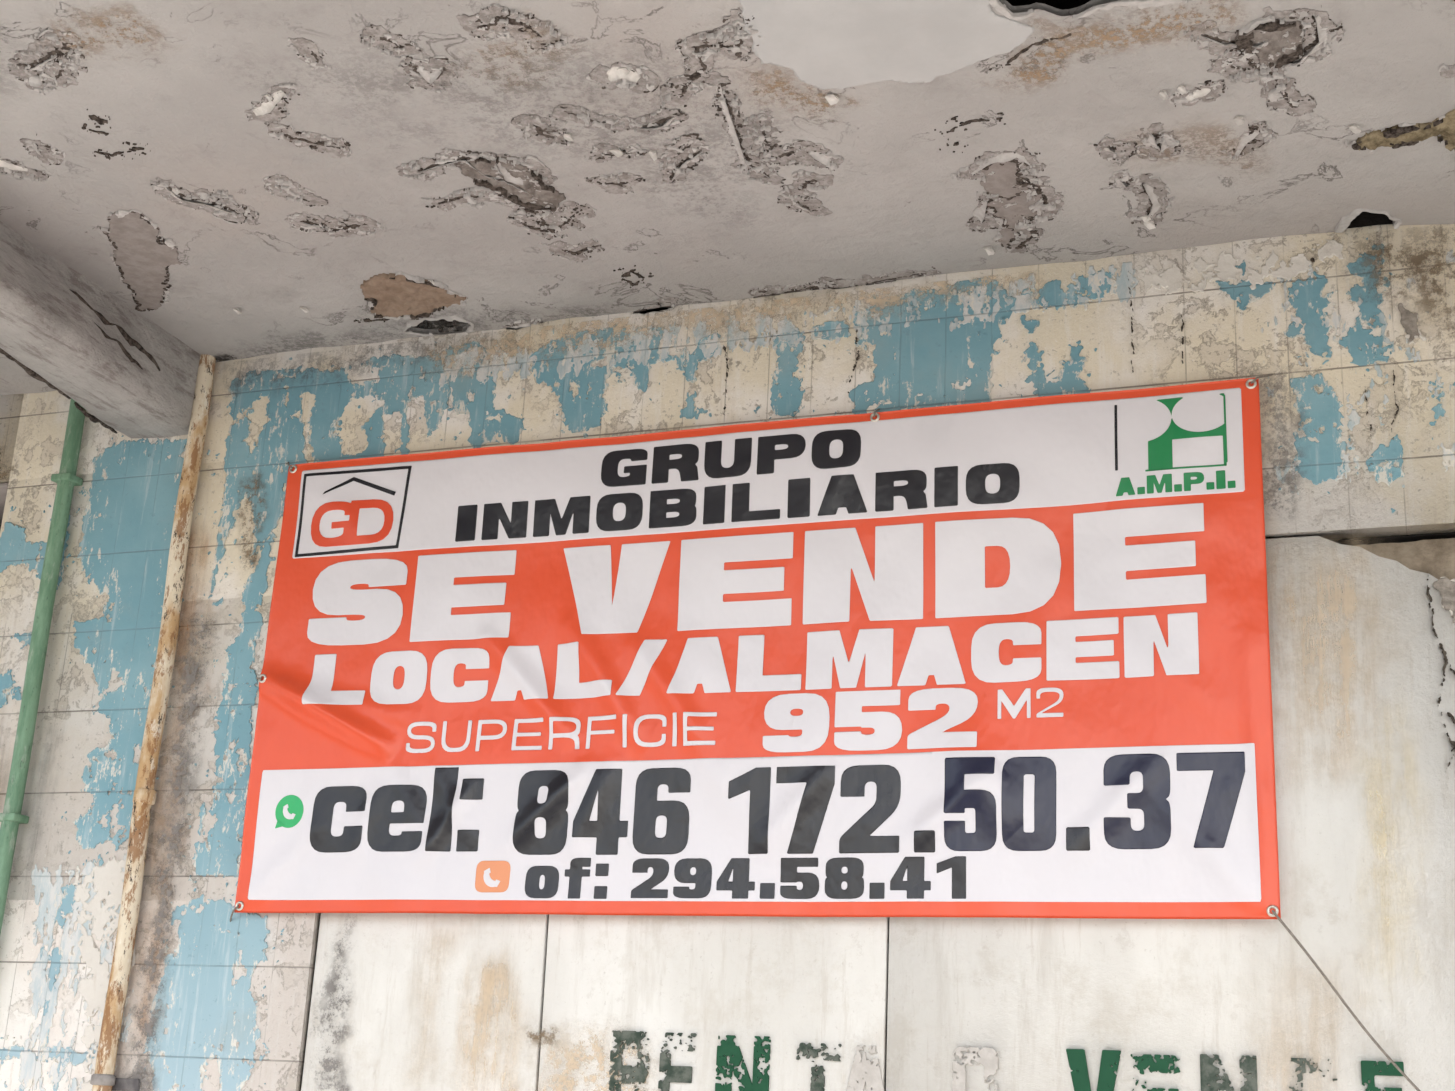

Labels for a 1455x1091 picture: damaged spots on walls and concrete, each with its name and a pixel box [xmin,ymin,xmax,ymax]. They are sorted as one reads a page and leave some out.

spalling [988,0,1196,20]
flaking render [1235,14,1312,69]
flaking render [447,152,566,213]
flaking render [825,94,840,105]
flaking render [976,159,1044,255]
spalling [1344,109,1455,162]
flaking render [99,209,182,312]
peeling [1426,372,1455,472]
peeling [119,208,1429,1091]
crack [1426,579,1455,772]
peeling [0,435,187,1091]